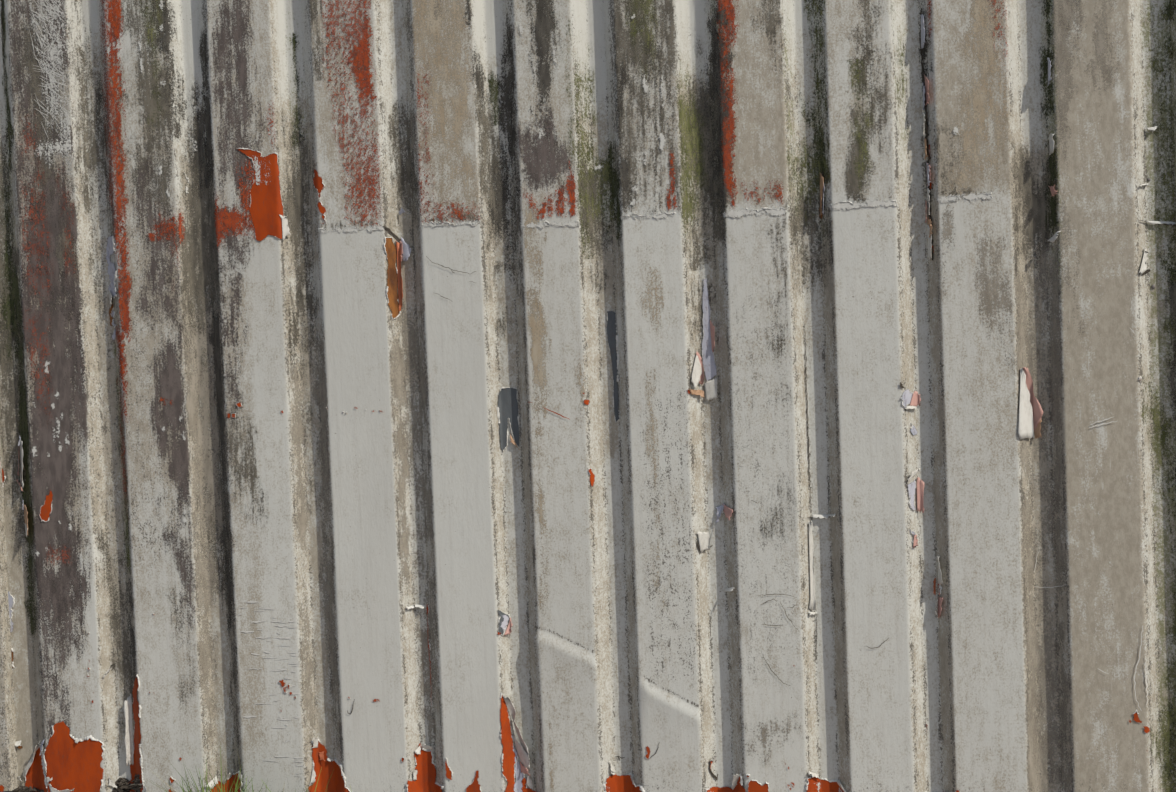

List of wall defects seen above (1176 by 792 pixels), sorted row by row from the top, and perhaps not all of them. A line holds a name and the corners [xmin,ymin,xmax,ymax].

peeling [214,103,291,250]
peeling [319,0,381,226]
leakage [472,0,576,297]
peeling [99,0,132,507]
leakage [8,0,137,739]
leakage [121,0,265,760]
peeling [497,387,520,452]
peeling [1018,367,1043,439]
peeling [23,674,150,792]
peeling [308,737,351,792]
peeling [401,742,453,792]
peeling [500,692,536,792]